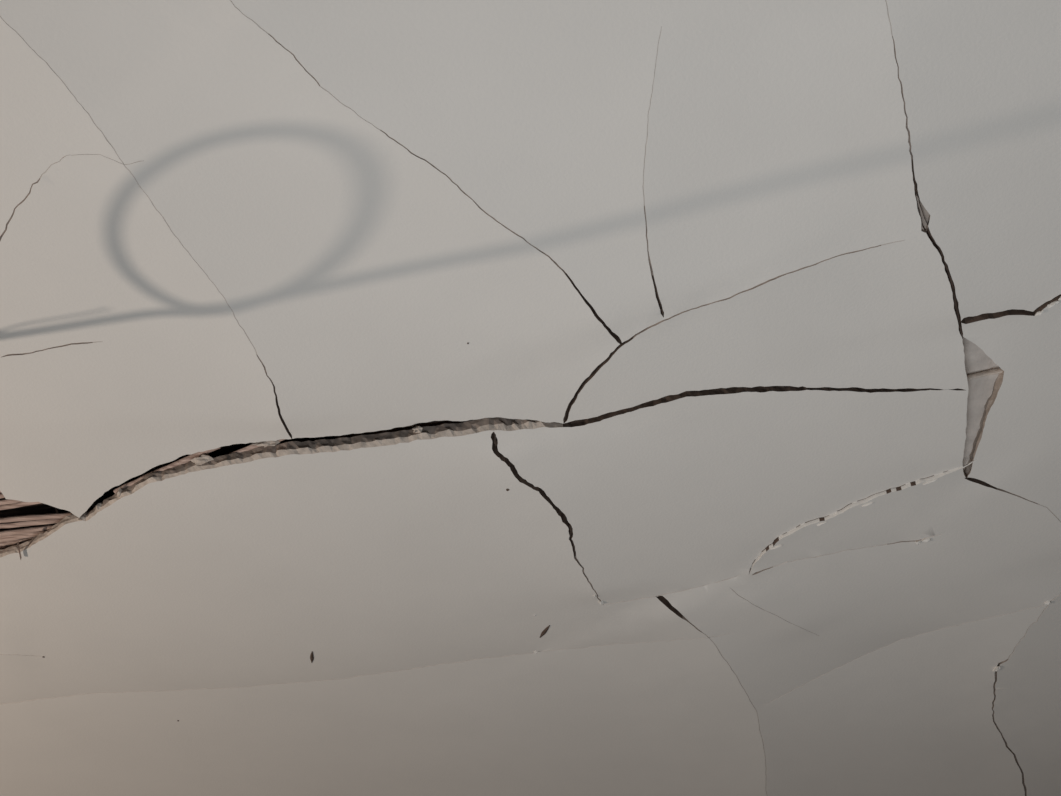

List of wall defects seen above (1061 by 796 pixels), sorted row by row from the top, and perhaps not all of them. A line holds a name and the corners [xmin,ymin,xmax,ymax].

crack [885,0,1061,338]
crack [0,0,964,605]
flaking render [0,491,105,560]
crack [749,459,1061,575]
crack [647,584,767,778]
crack [992,593,1061,796]